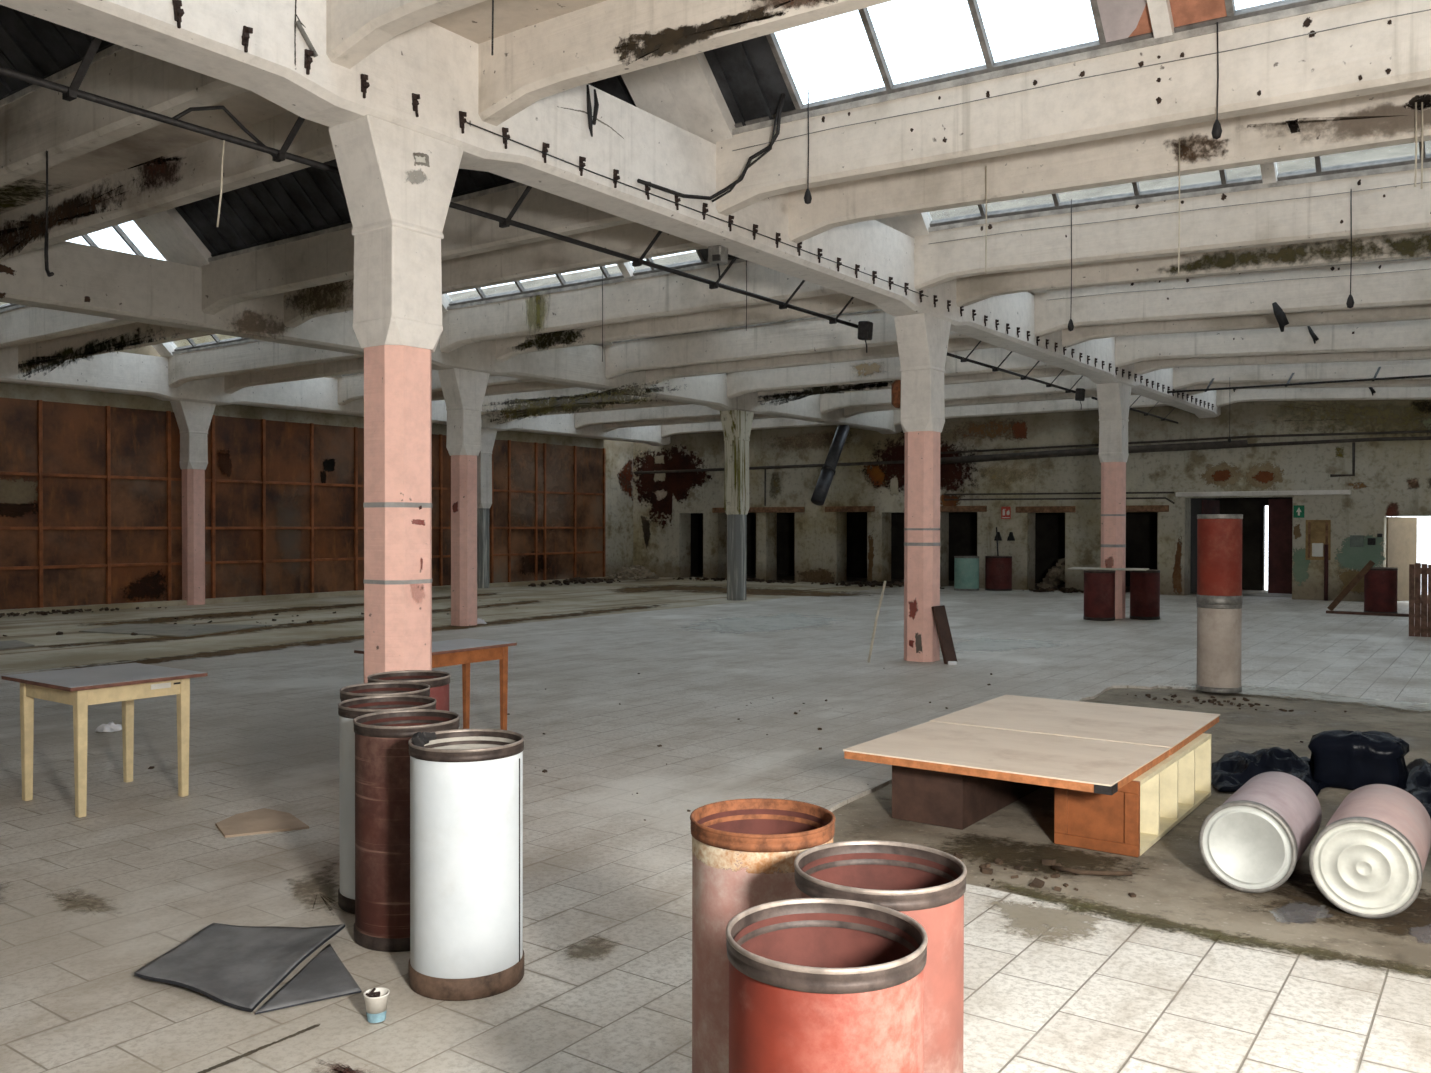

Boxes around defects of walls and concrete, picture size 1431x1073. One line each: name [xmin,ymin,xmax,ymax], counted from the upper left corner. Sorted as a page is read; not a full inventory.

mould [614,0,835,64]
water stain [130,157,181,190]
water stain [0,180,125,258]
mould [1167,234,1431,274]
mould [286,281,353,315]
mould [232,311,286,338]
mould [18,328,165,378]
water stain [487,380,669,424]
peeling [653,455,668,501]